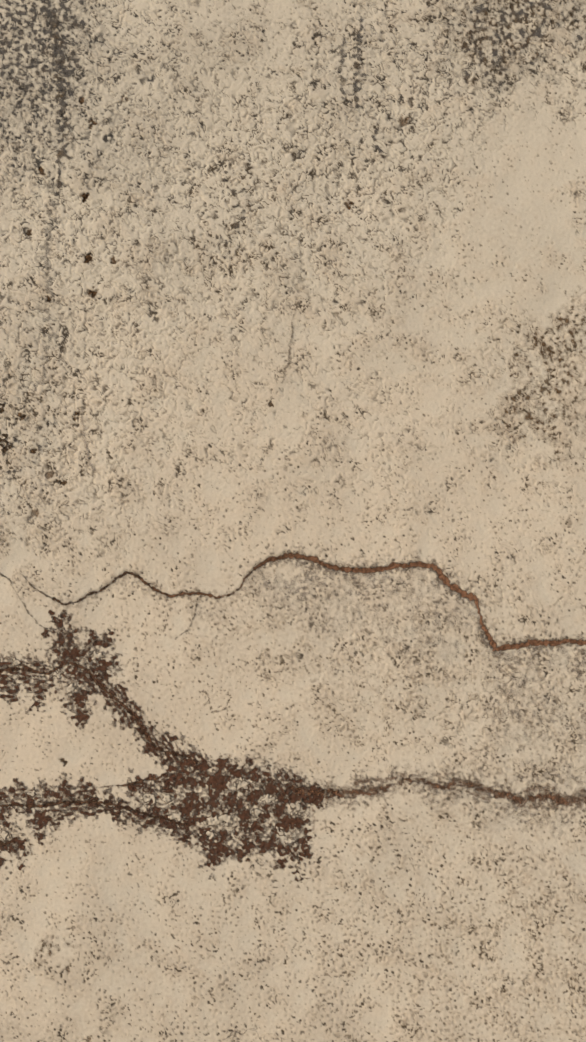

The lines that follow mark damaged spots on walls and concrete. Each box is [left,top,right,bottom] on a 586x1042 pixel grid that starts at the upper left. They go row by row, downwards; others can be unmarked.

crack [0,550,586,654]
rust [0,610,345,881]
crack [290,773,586,812]